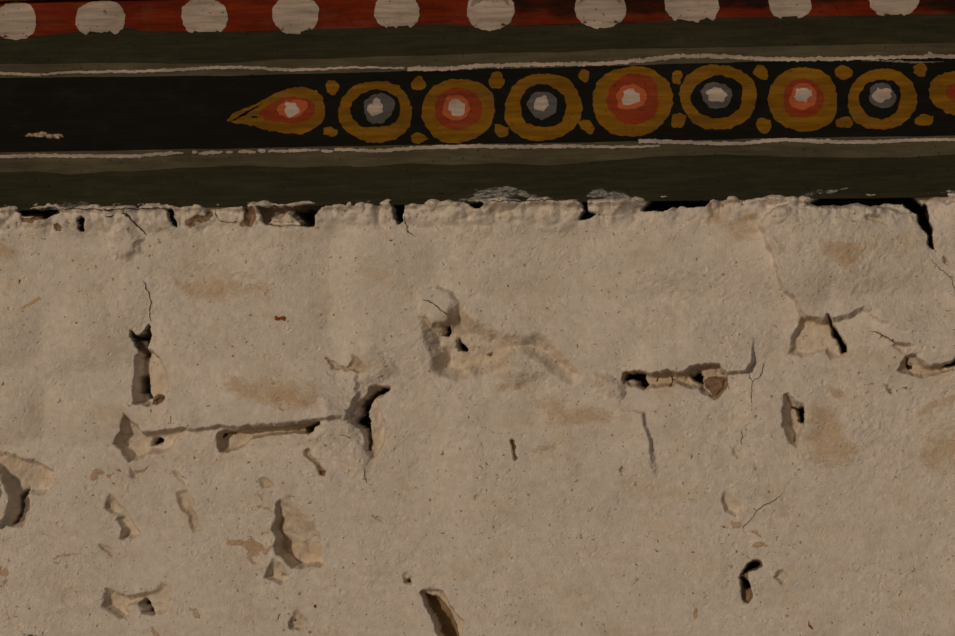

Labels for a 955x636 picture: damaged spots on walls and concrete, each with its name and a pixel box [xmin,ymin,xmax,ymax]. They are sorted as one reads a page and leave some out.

peeling [185,211,213,228]
spalling [239,205,325,227]
spalling [131,325,152,354]
spalling [421,303,582,383]
spalling [623,365,729,401]
spalling [783,394,806,448]
spalling [115,414,188,479]
spalling [105,493,142,540]
spalling [226,477,324,585]
spalling [722,489,768,604]
spalling [103,581,173,620]